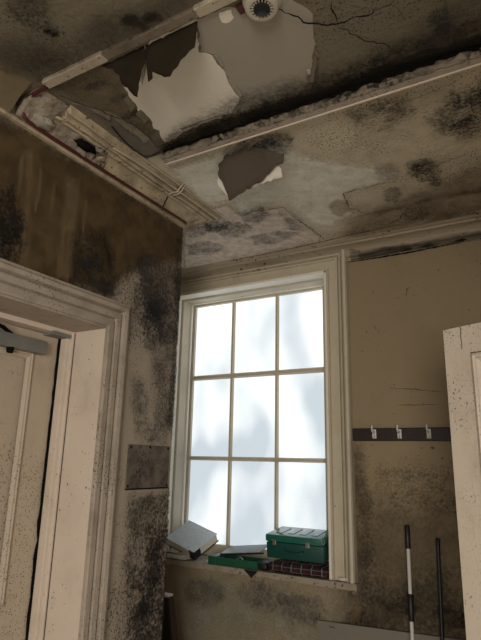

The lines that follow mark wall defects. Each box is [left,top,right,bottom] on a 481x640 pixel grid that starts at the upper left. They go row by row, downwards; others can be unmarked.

peeling [72,0,481,161]
water stain [163,10,481,150]
crack [279,0,406,49]
water stain [0,115,320,443]
peeling [171,143,398,226]
water stain [351,232,481,261]
water stain [124,493,170,640]